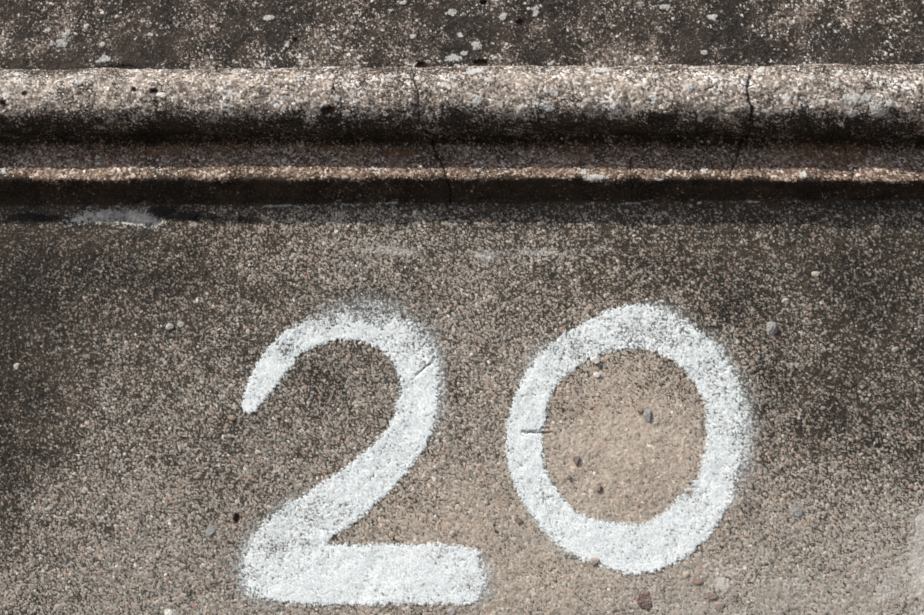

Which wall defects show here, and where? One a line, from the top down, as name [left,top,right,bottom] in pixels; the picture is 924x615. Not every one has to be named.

crack [412,70,453,204]
crack [729,75,754,179]